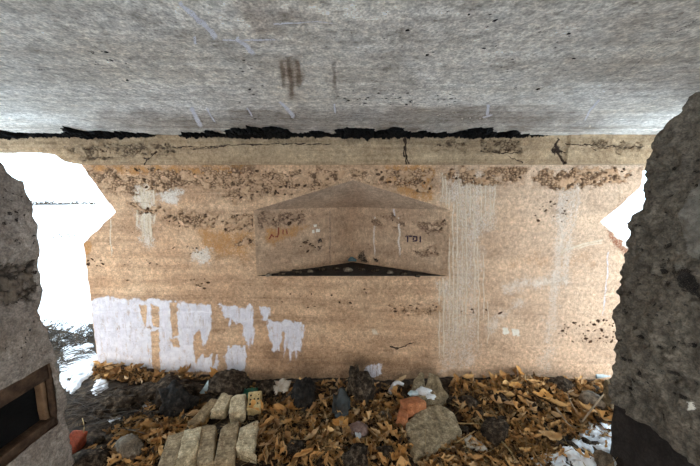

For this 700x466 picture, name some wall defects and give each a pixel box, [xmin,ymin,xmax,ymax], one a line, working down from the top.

crack [402,137,410,164]
crack [551,137,616,165]
leakage [434,167,581,375]